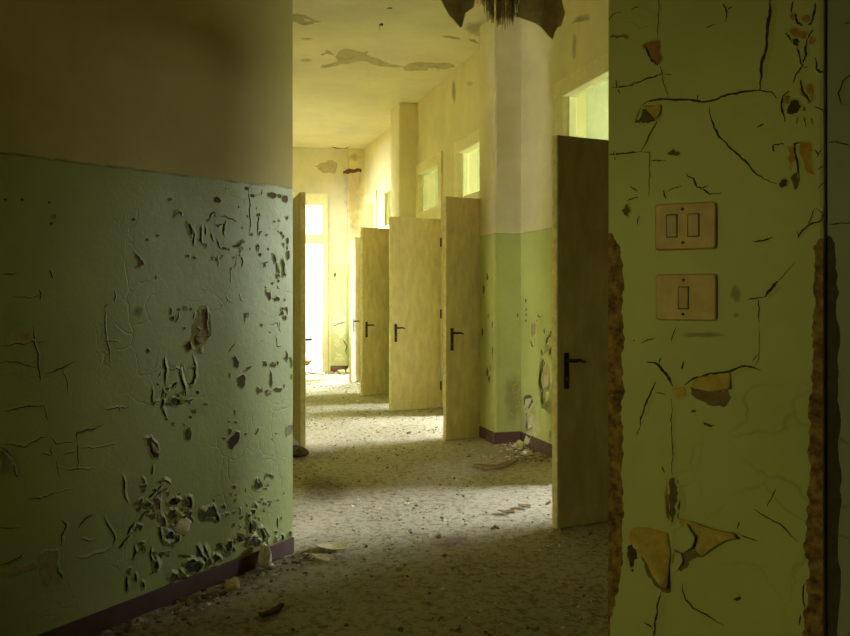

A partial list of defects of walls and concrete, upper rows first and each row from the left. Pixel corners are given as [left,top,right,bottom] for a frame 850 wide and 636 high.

crack [609,0,777,190]
crack [609,150,723,199]
crack [794,141,850,242]
peeling [204,215,290,321]
crack [747,262,796,368]
peeling [228,342,293,397]
peeling [512,298,552,445]
crack [637,382,678,475]
spalling [608,233,761,636]
spalling [799,235,842,636]
peeling [125,472,293,592]
crack [643,583,724,636]